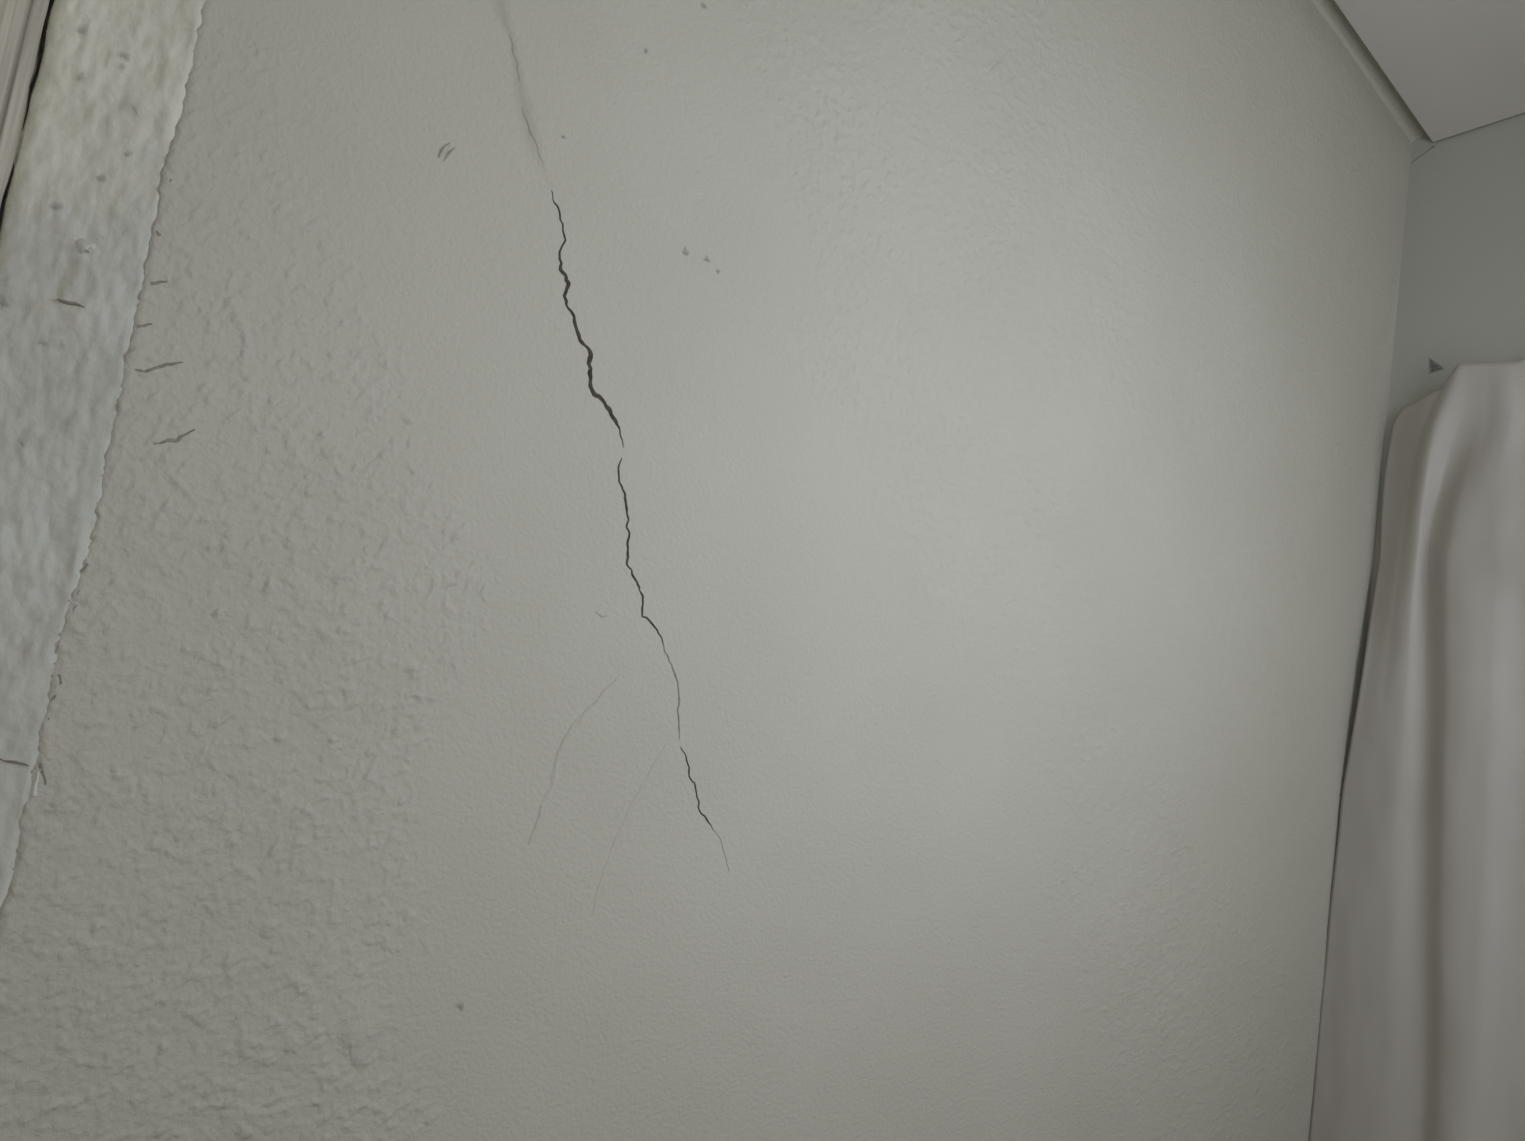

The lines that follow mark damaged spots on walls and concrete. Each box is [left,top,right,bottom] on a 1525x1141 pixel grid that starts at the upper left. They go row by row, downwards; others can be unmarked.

crack [509,34,729,869]